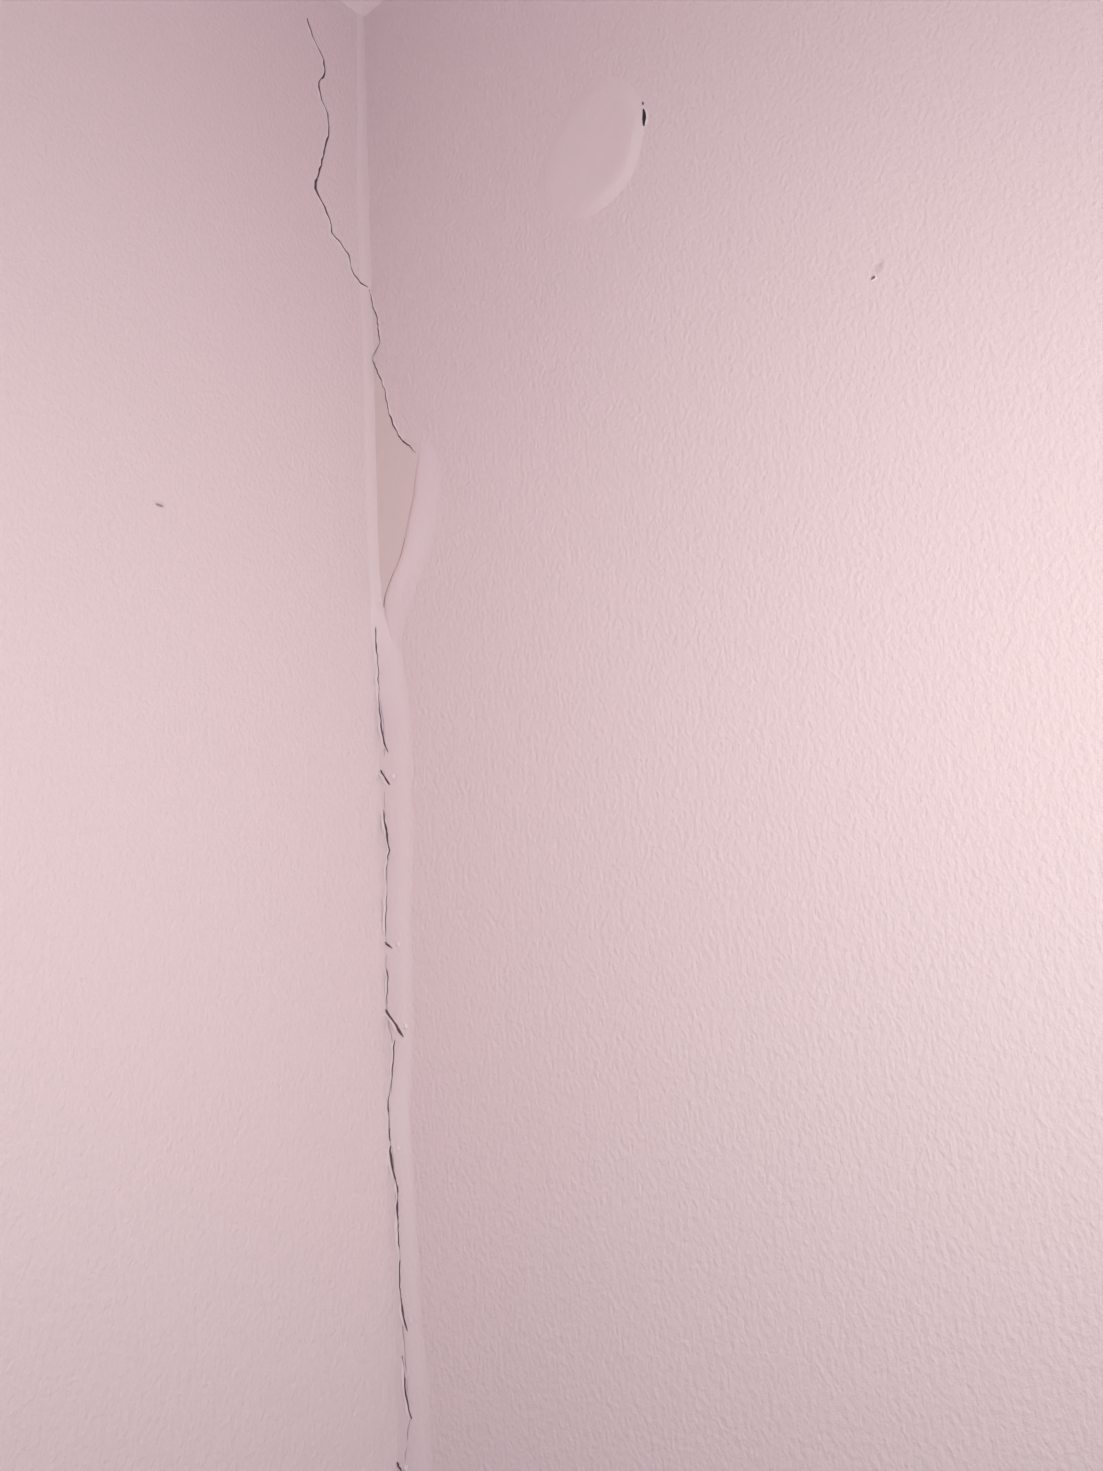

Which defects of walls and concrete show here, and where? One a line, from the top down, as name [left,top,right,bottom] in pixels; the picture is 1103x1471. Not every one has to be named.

crack [306,19,416,453]
crack [373,628,412,1471]